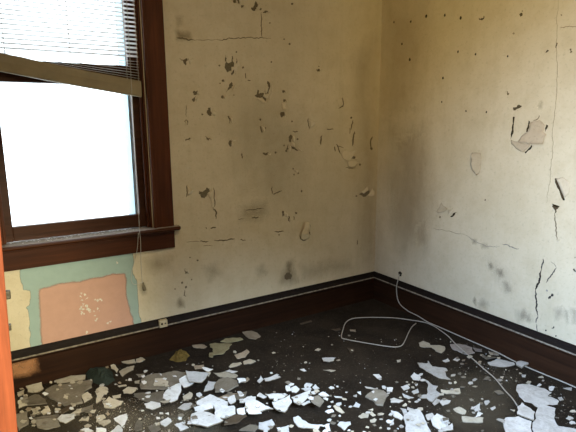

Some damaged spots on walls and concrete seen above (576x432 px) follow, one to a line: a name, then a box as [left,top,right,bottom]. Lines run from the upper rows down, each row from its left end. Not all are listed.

crack [178,15,271,41]
peeling [218,51,251,81]
peeling [511,115,548,153]
crack [546,12,576,243]
peeling [186,186,217,218]
peeling [555,177,570,200]
flaking render [20,253,141,347]
crack [535,260,556,329]